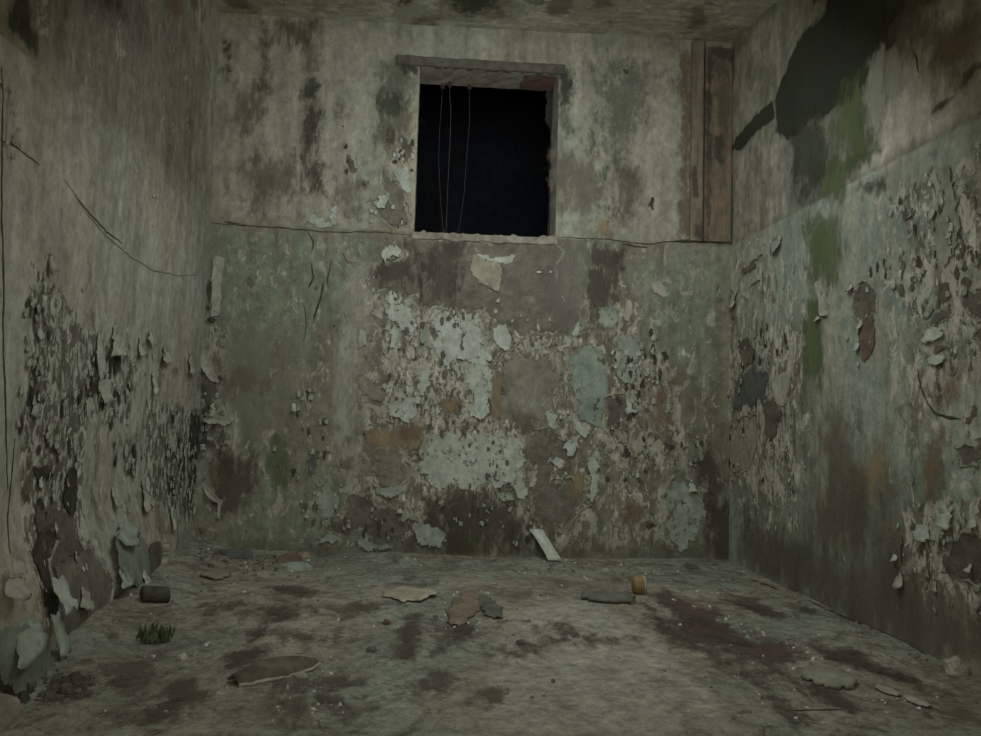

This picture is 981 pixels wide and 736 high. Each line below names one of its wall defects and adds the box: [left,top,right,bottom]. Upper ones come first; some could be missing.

damp [241,39,324,215]
damp [376,56,417,149]
damp [732,0,944,205]
flaking render [267,133,707,552]
damp [802,214,839,388]
peeling [813,280,830,322]
peeling [844,164,981,469]
flaking render [17,253,233,635]
flaking render [890,496,981,615]